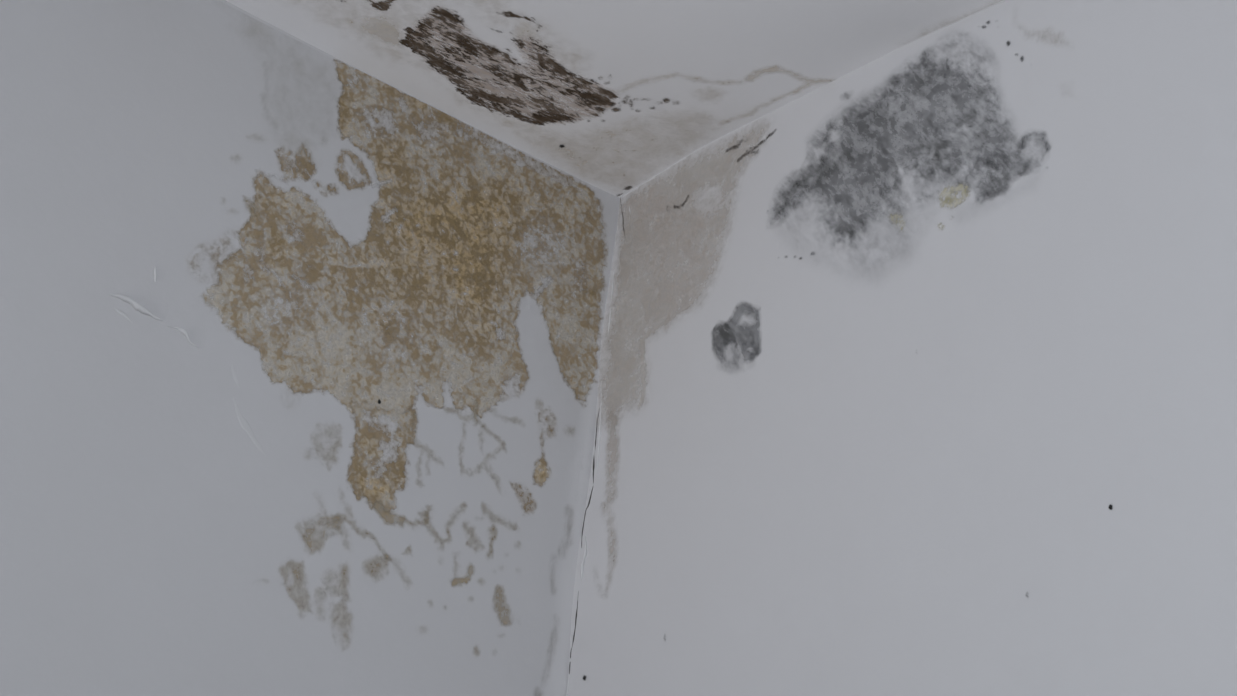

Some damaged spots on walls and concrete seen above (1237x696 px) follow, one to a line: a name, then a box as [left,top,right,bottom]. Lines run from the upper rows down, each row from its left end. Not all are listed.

damp [369,0,632,126]
damp [776,59,1049,238]
damp [204,60,760,525]